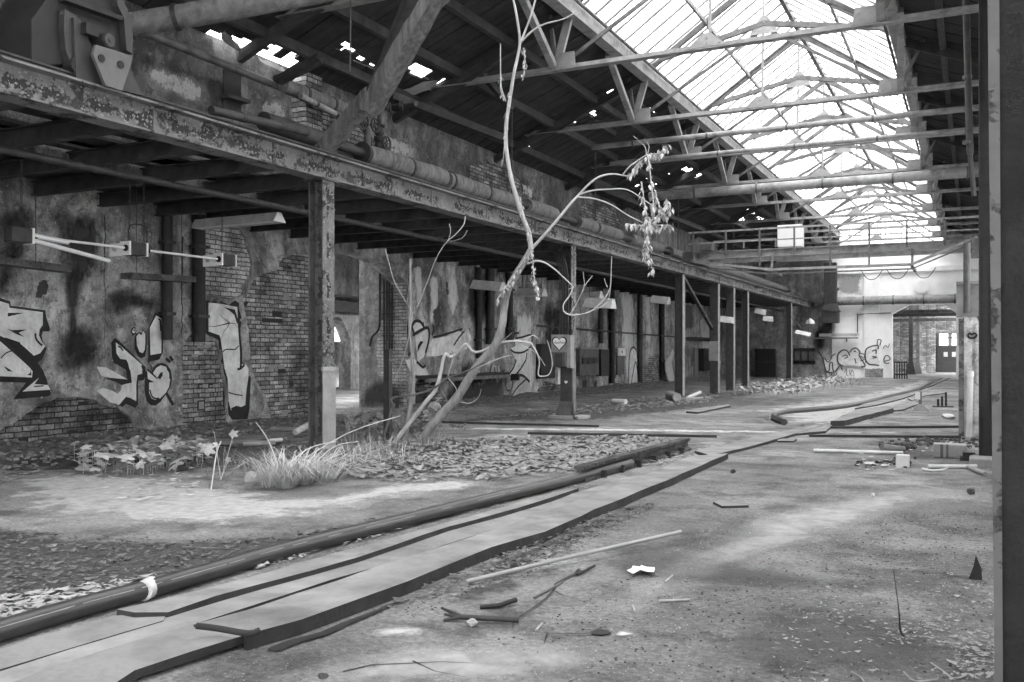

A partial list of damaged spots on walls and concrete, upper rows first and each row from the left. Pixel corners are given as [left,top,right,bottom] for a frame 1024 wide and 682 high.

flaking render [0,66,688,442]